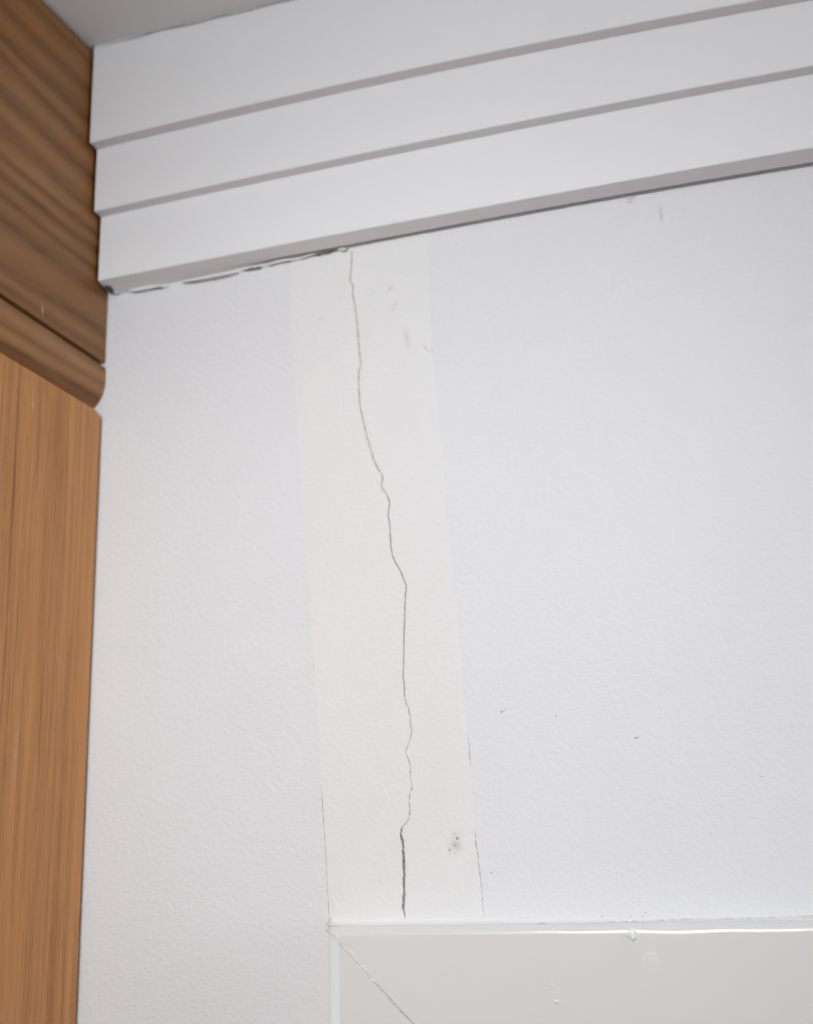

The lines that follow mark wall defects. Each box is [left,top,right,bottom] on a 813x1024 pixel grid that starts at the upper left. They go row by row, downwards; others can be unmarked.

crack [359,399,412,915]